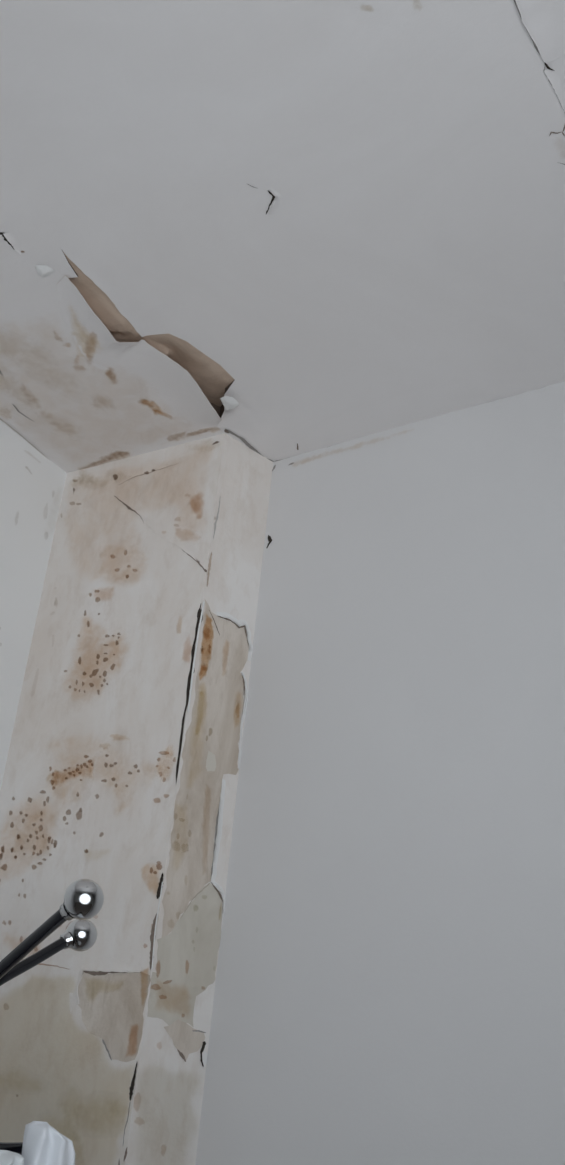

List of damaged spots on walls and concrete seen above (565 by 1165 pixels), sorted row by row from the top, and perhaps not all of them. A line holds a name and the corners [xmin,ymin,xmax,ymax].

peeling [35,244,239,430]
crack [115,464,221,782]
crack [150,873,163,970]
peeling [74,600,253,1063]
crack [118,1063,137,1165]